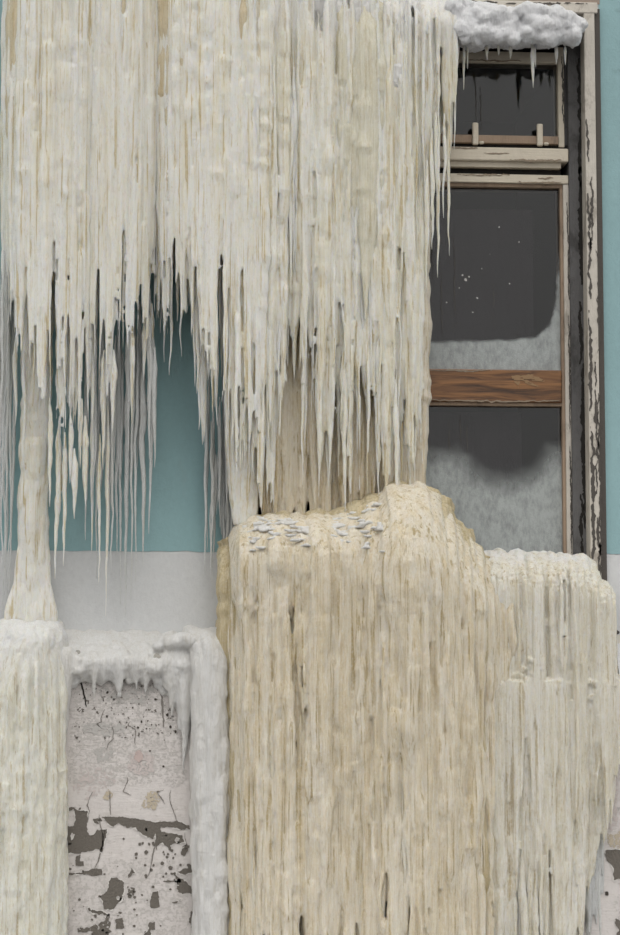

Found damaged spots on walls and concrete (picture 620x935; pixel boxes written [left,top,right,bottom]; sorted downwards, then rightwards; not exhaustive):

peeling [67,807,193,935]
peeling [605,849,620,881]